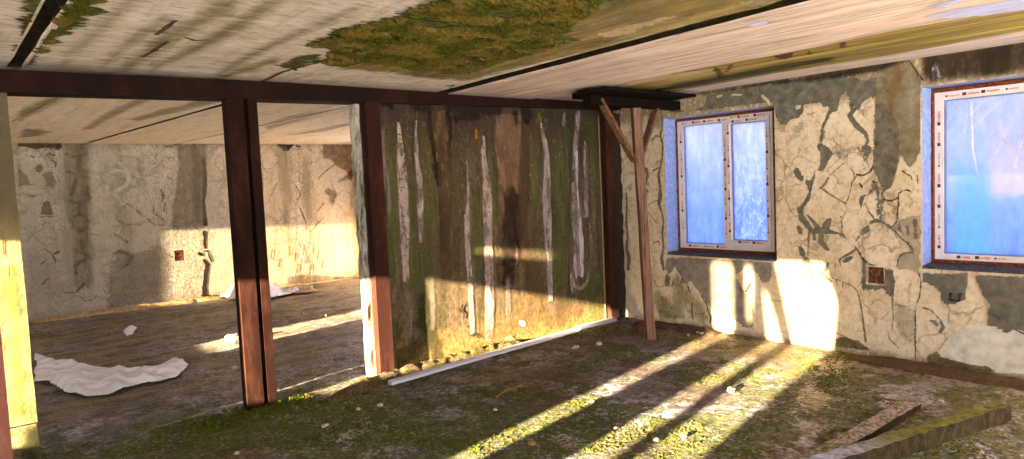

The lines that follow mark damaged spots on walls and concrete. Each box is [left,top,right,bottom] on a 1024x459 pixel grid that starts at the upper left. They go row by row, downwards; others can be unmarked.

crack [197,159,217,297]
crack [261,164,335,232]
leakage [381,104,452,283]
leakage [464,108,553,341]
leakage [562,110,601,317]
spalling [689,60,1024,335]
crack [819,145,919,220]
spalling [927,352,994,372]